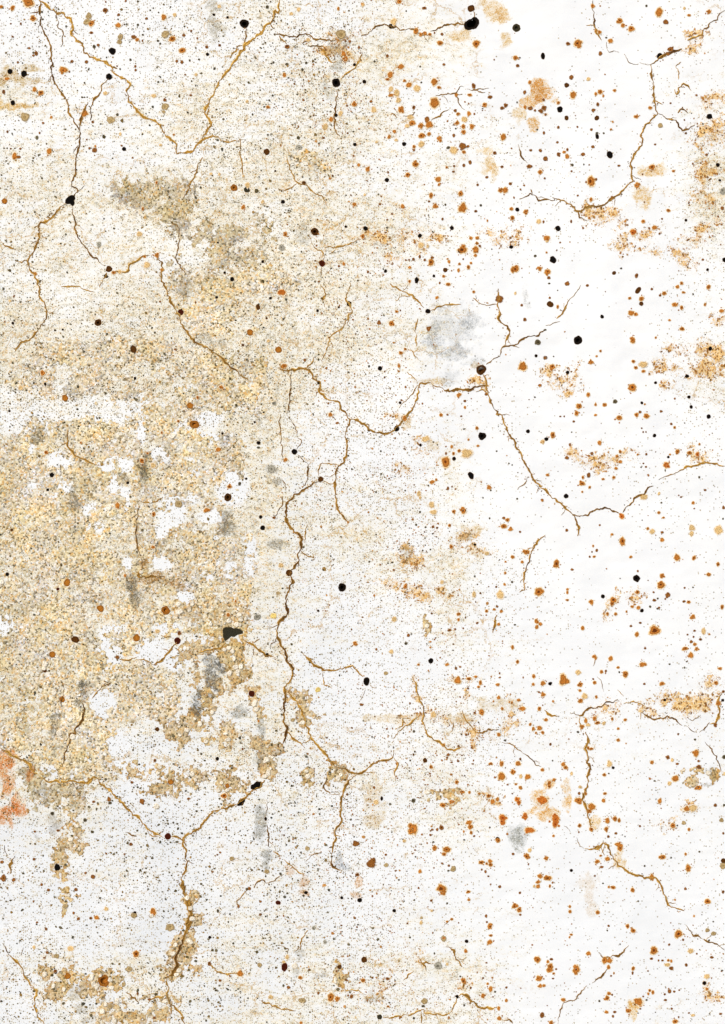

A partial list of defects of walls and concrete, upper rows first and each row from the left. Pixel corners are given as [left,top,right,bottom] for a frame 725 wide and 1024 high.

crack [1,0,486,382]
corrosion [413,26,444,46]
corrosion [373,54,508,222]
corrosion [523,75,617,116]
crack [520,1,725,221]
crack [1,235,725,1024]
corrosion [439,733,639,916]